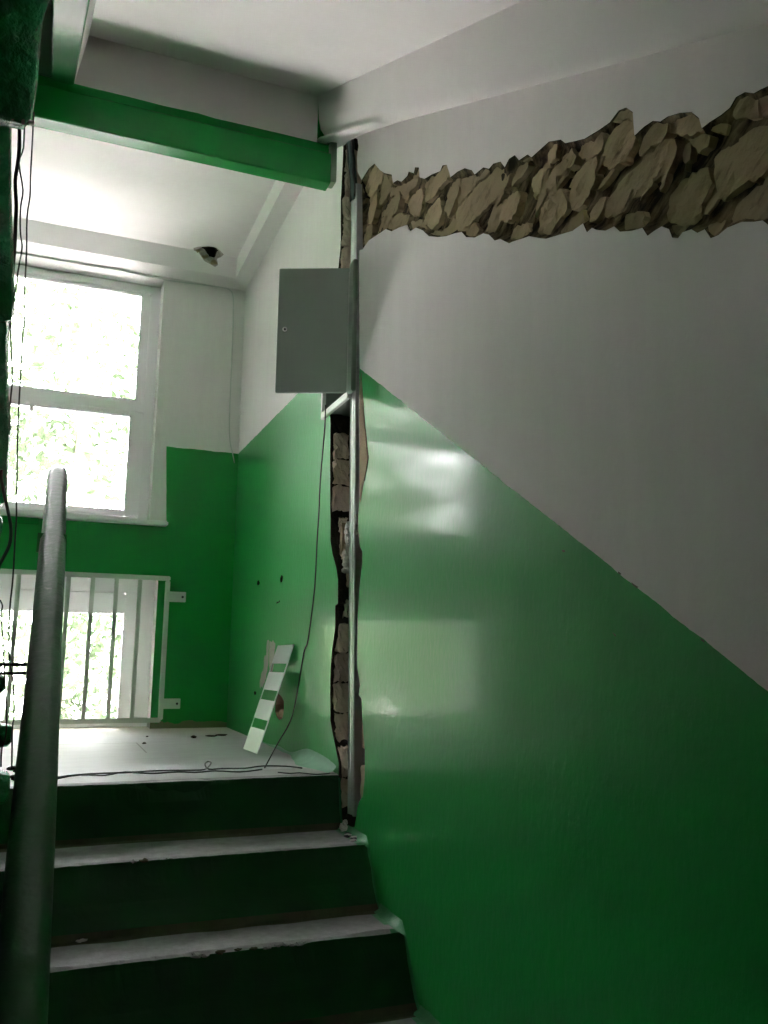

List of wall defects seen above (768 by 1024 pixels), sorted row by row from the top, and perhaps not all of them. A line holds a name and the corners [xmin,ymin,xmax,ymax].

flaking render [362,87,768,248]
spalling [194,246,224,267]
peeling [359,373,369,502]